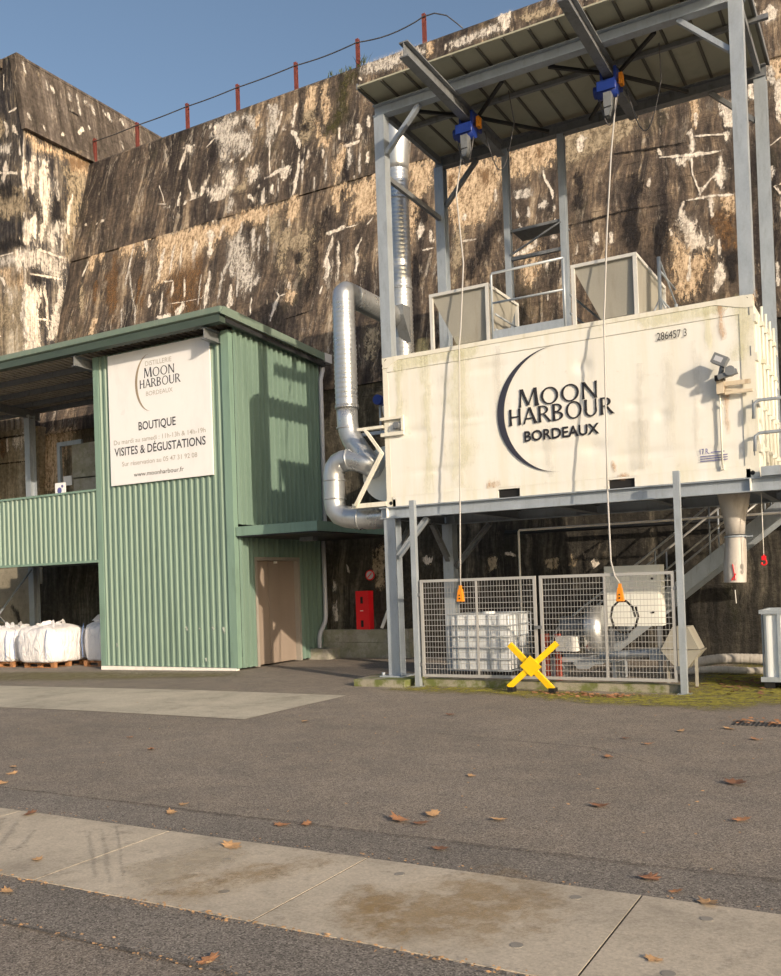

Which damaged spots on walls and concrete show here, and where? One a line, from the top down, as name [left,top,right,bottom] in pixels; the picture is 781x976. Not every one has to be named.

leakage [68,93,124,135]
leakage [165,103,371,208]
leakage [0,140,88,350]
leakage [120,244,186,328]
leakage [198,203,275,314]
leakage [304,205,345,310]